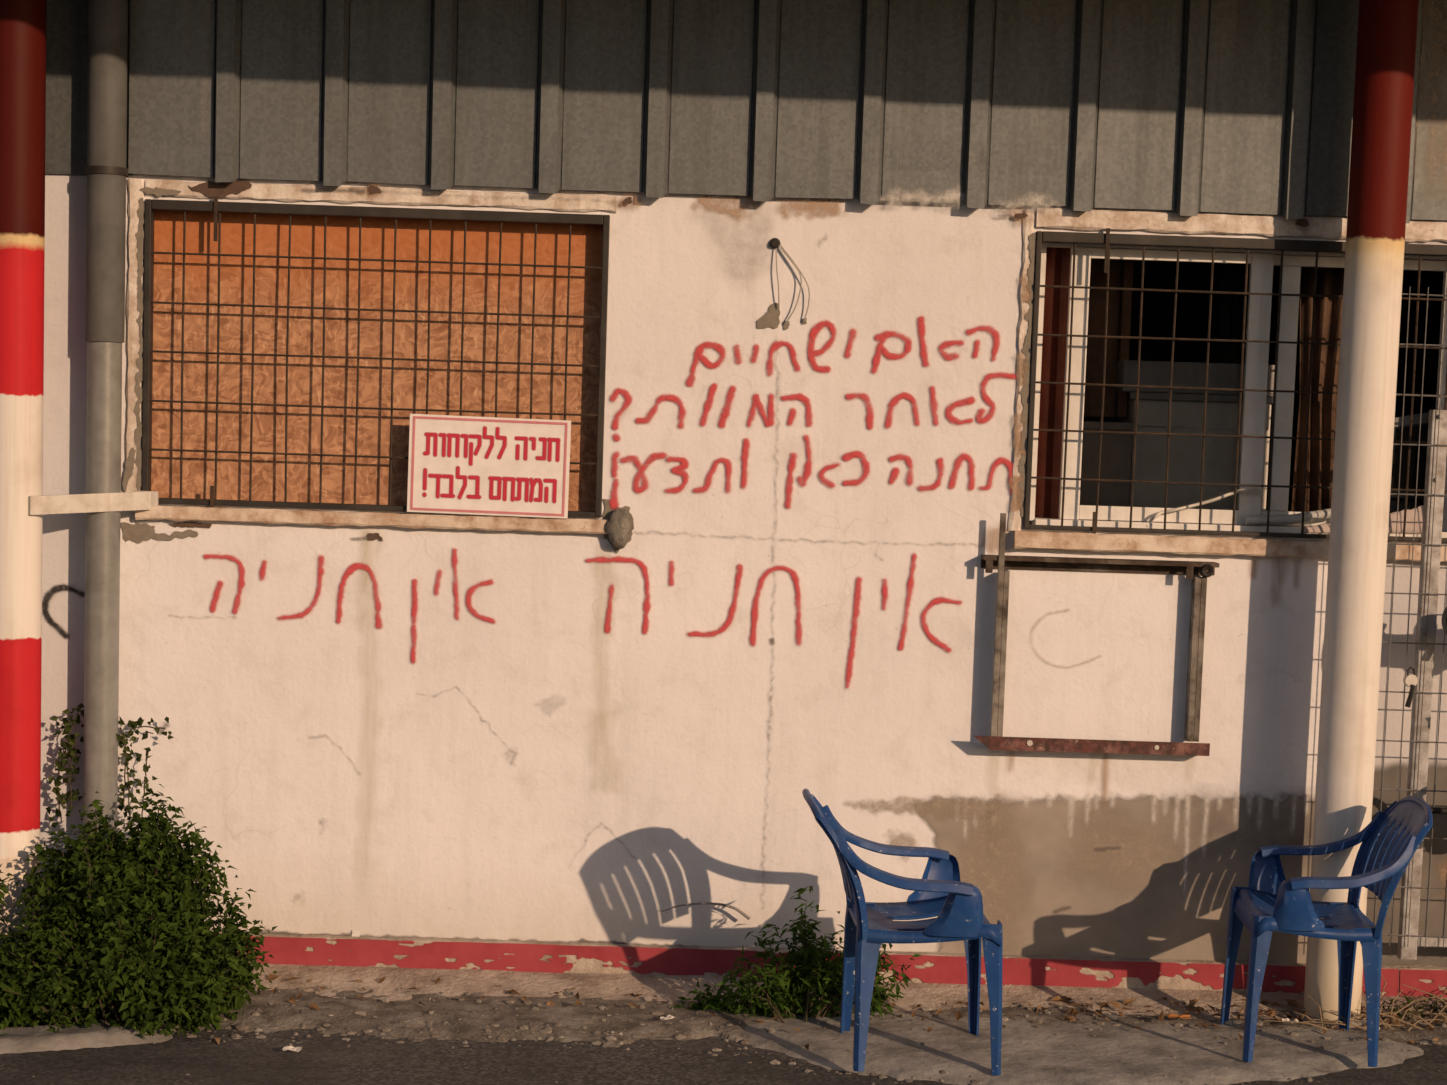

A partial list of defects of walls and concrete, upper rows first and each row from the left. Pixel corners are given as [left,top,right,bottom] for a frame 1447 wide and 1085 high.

peeling [122,180,252,491]
spalling [121,522,212,544]